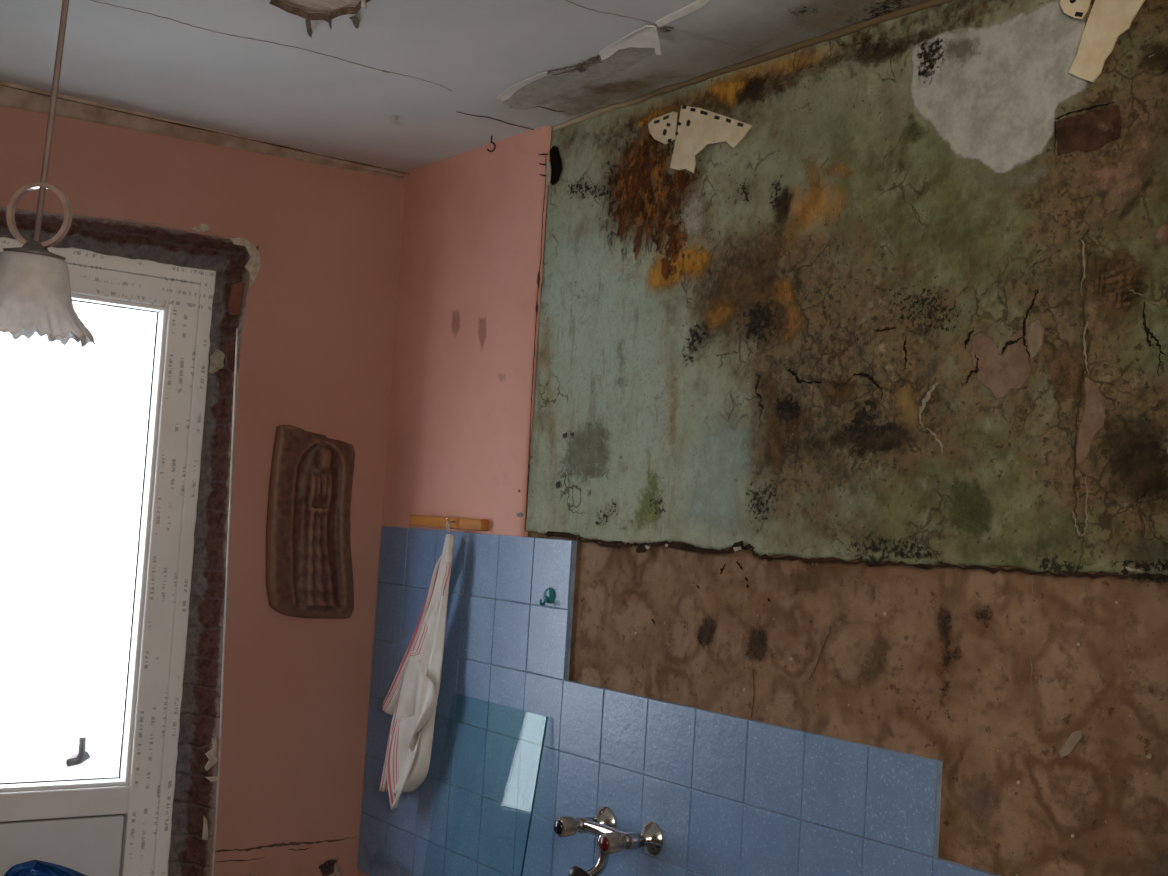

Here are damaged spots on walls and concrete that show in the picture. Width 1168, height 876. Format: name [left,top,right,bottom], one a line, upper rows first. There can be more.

crack [91,0,565,130]
flaking render [497,0,710,109]
flaking render [899,0,1121,184]
damp [648,247,710,289]
damp [683,175,796,365]
crack [787,324,908,404]
crack [1129,289,1168,376]
damp [556,423,609,488]
damp [745,379,804,523]
spalling [0,181,274,876]
peeling [544,531,1168,588]
crack [215,837,355,862]